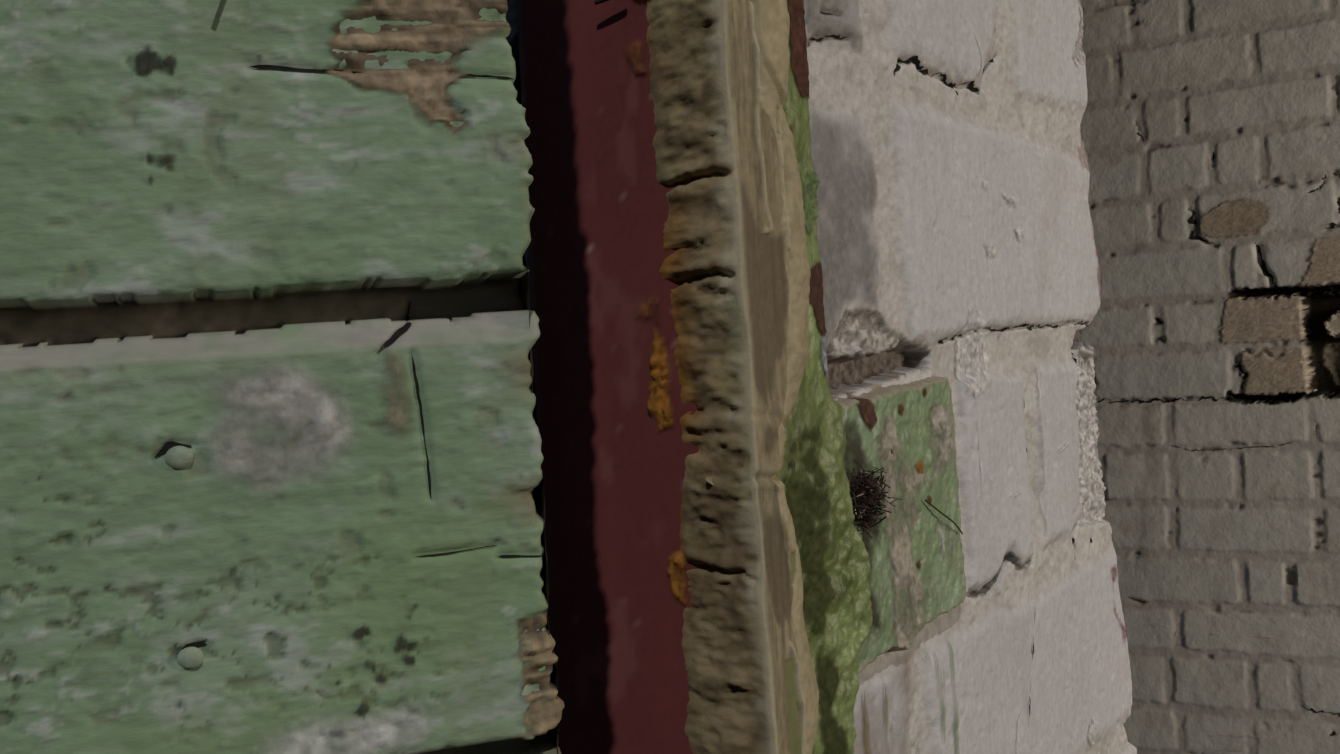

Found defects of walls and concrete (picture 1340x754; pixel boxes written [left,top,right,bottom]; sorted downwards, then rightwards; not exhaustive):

peeling [328,0,511,133]
peeling [1199,198,1270,238]
peeling [1221,237,1340,405]
peeling [518,610,565,736]